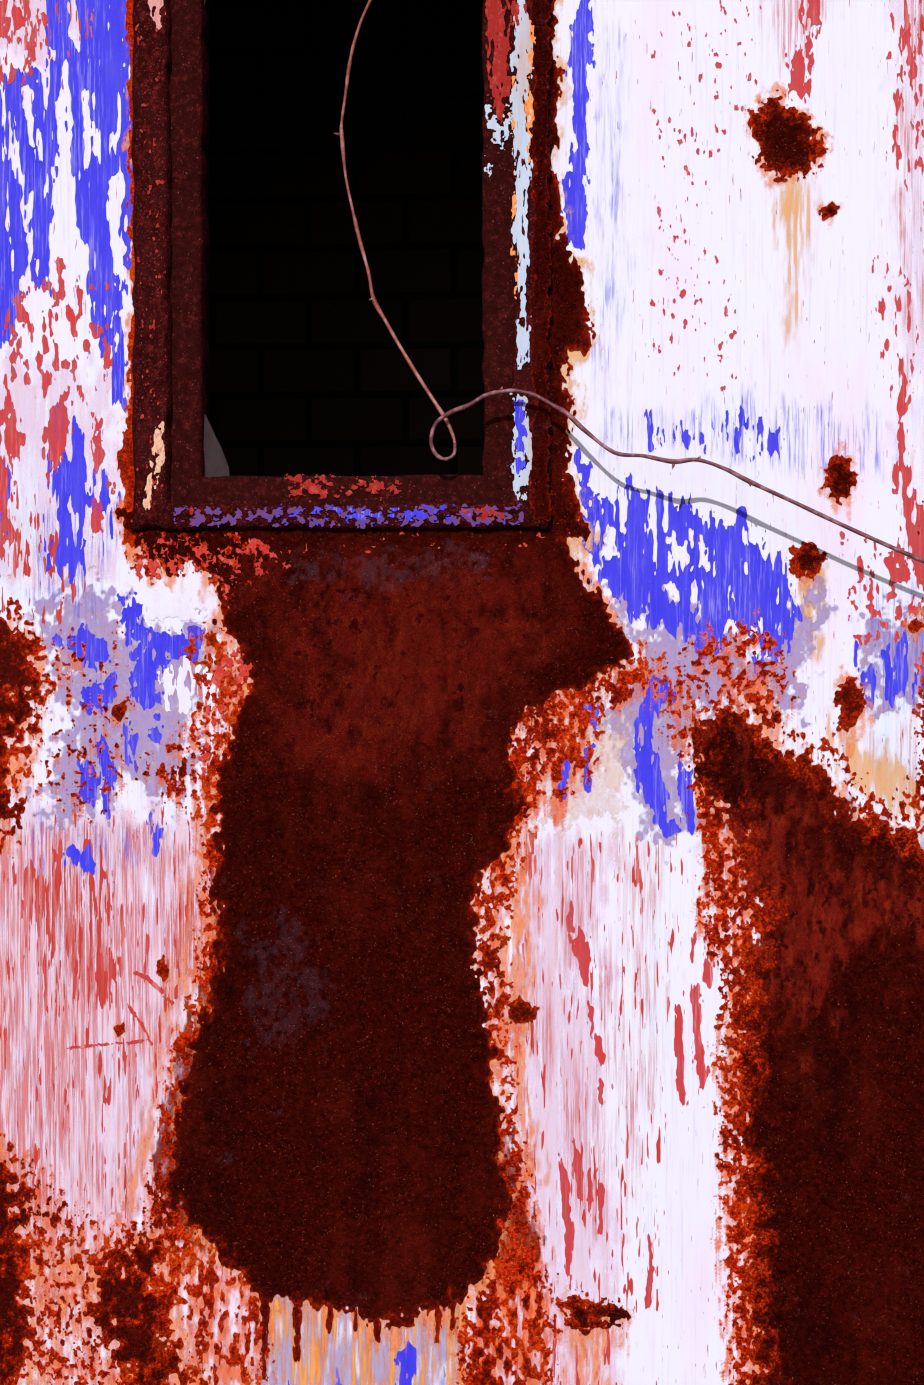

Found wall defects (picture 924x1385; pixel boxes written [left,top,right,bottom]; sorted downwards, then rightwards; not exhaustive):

peeling [0,0,166,585]
rust [122,0,135,292]
peeling [485,0,536,370]
rust [745,82,840,331]
rust [0,597,135,858]
rust [156,741,188,814]
peeling [52,393,547,820]
peeling [632,675,695,838]
peeling [574,447,803,677]
rust [818,447,858,510]
peeling [840,255,924,710]
rust [555,1290,631,1385]